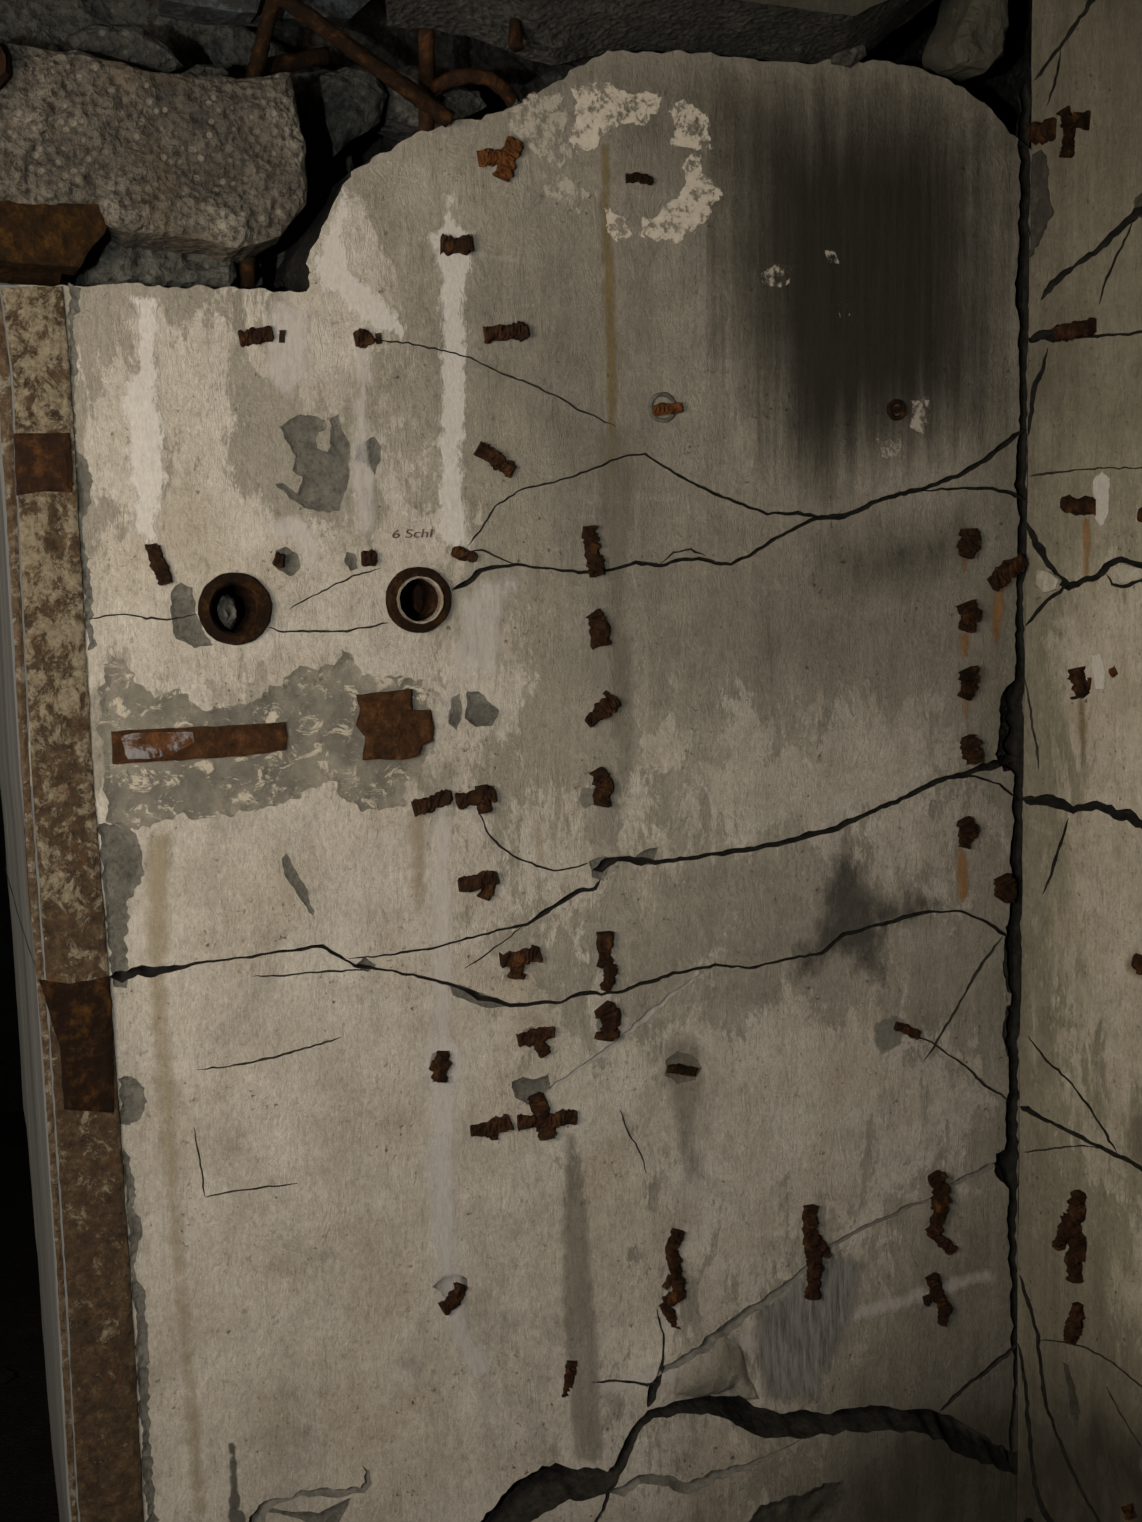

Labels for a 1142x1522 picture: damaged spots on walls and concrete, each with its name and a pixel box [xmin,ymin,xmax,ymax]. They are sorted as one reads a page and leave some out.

crack [1034,0,1095,106]
peeling [509,82,723,244]
crack [381,340,616,427]
crack [452,84,1142,627]
peeling [877,398,930,458]
crack [89,613,197,621]
spalling [67,283,499,988]
spalling [448,984,505,1008]
crack [110,567,1142,1522]
spalling [118,1076,147,1125]
spalling [123,1148,159,1522]
spalling [749,1480,846,1522]